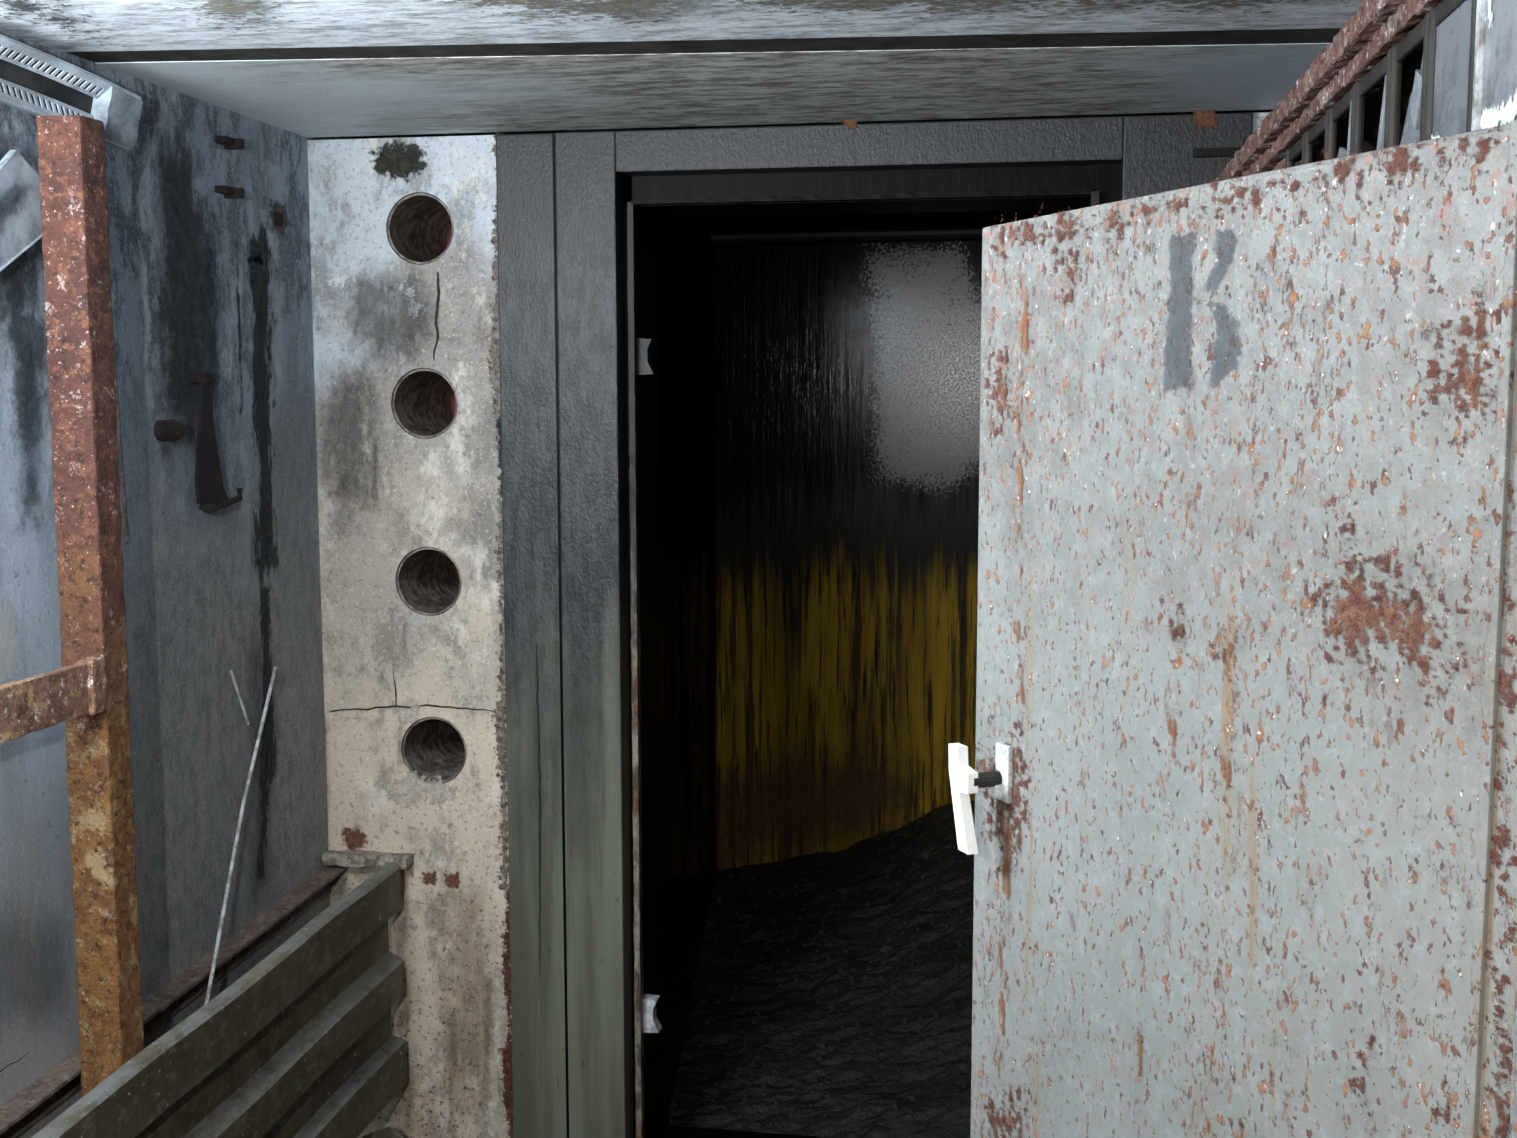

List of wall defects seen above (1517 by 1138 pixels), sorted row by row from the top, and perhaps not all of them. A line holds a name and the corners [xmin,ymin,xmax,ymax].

damp [414,0,1312,29]
rust [1194,110,1218,128]
damp [369,139,427,182]